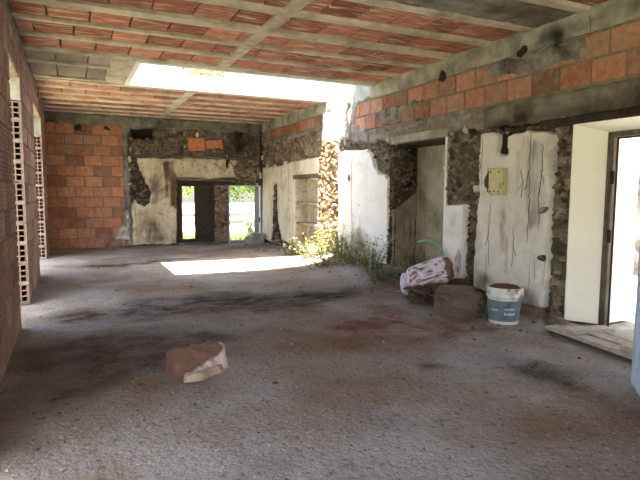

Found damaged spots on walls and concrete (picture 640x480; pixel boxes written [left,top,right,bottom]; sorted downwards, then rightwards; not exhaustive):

spalling [127,128,418,266]
spalling [443,123,573,318]
crack [511,139,544,266]